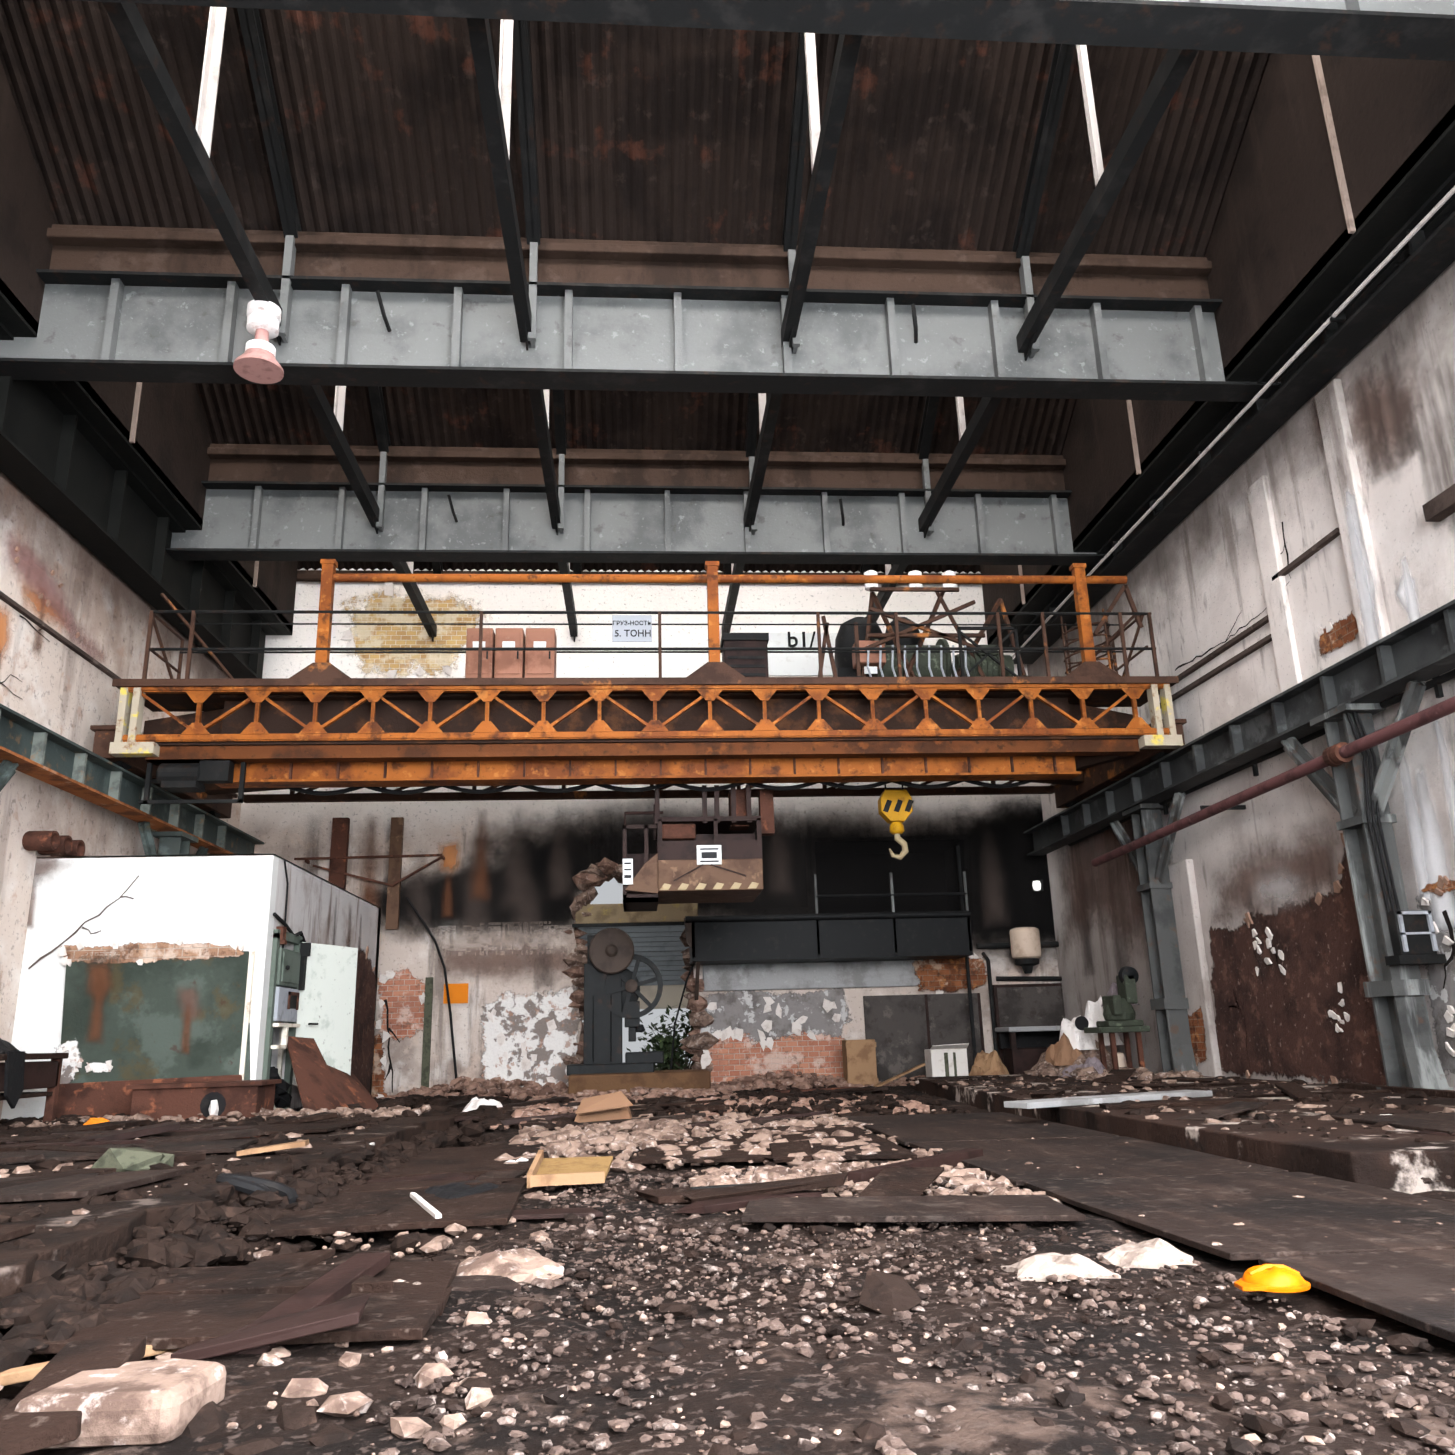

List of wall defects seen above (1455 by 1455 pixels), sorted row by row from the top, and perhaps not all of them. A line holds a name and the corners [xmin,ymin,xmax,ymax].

leakage [1355,384,1413,462]
flaking render [341,582,479,678]
flaking render [1315,607,1358,656]
peeling [58,939,245,967]
flaking render [344,946,425,1098]
peeling [480,857,623,1088]
peeling [679,929,853,1084]
flaking render [912,953,988,994]
peeling [1188,833,1387,1085]
peeling [1416,875,1455,1073]
crack [1442,910,1455,989]